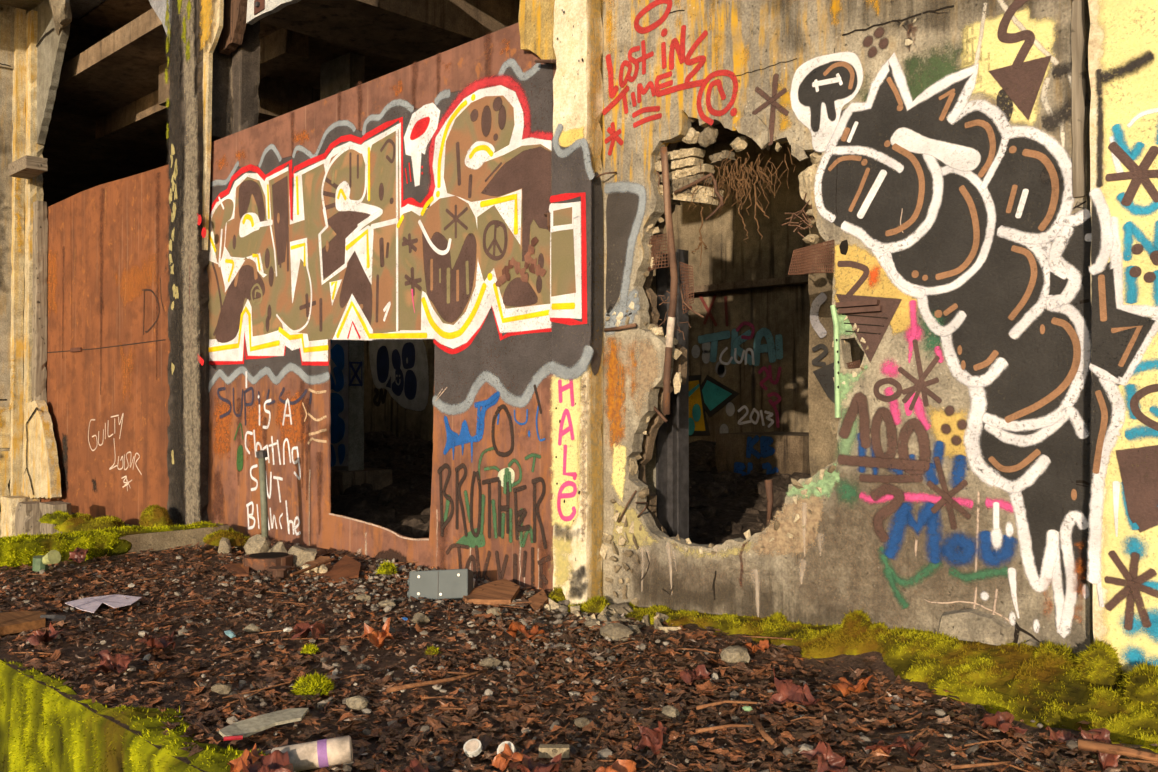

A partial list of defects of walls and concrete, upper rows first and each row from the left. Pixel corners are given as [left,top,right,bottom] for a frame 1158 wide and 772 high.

crack [834,5,954,53]
peeling [733,113,770,150]
peeling [791,142,808,161]
spalling [613,490,656,550]
spalling [672,464,840,556]